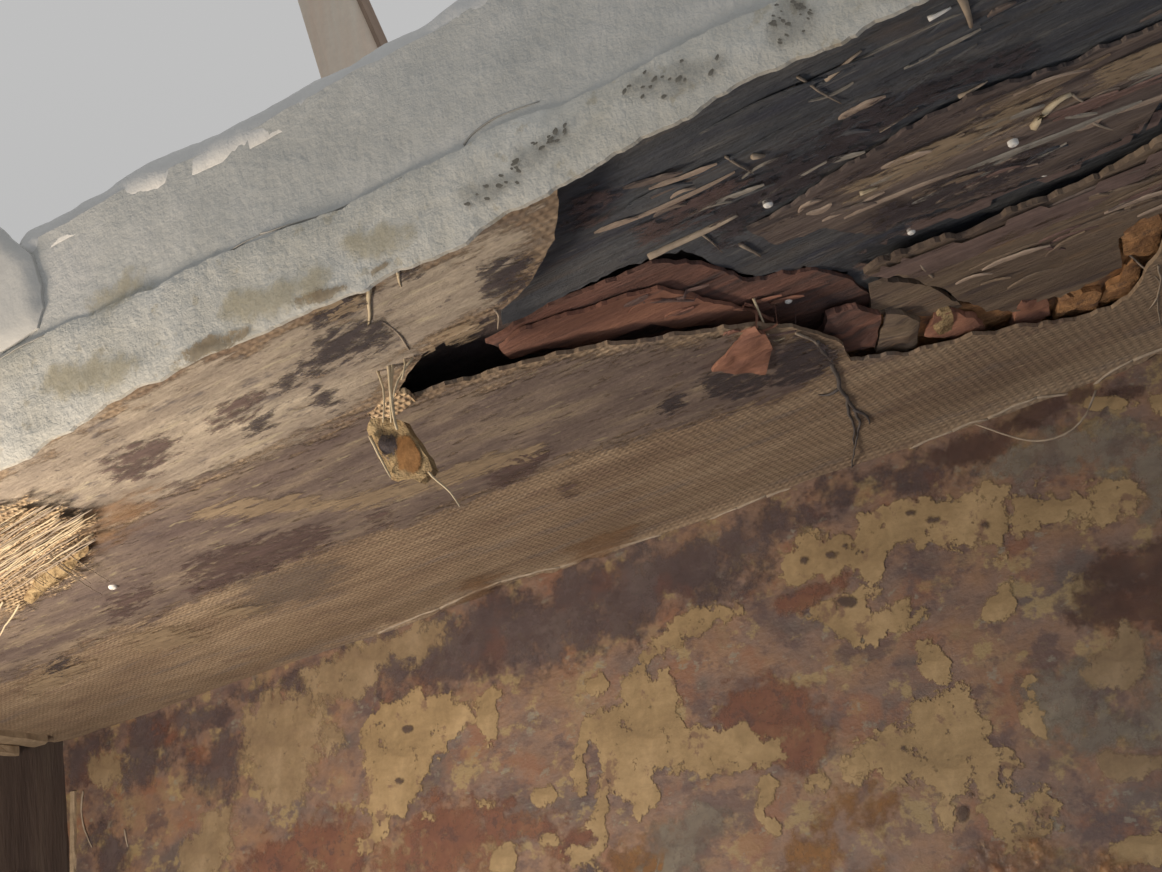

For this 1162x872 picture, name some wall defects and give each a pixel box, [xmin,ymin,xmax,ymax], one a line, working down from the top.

mould [768,0,813,44]
leakage [464,158,521,206]
leakage [421,253,543,355]
corrosion [395,435,421,473]
leakage [0,295,840,702]
crack [816,340,870,468]
peeling [778,476,1150,856]
peeling [237,617,502,857]
peeling [538,600,788,872]
corrosion [712,672,834,775]
corrosion [236,787,593,872]
peeling [1108,830,1162,868]